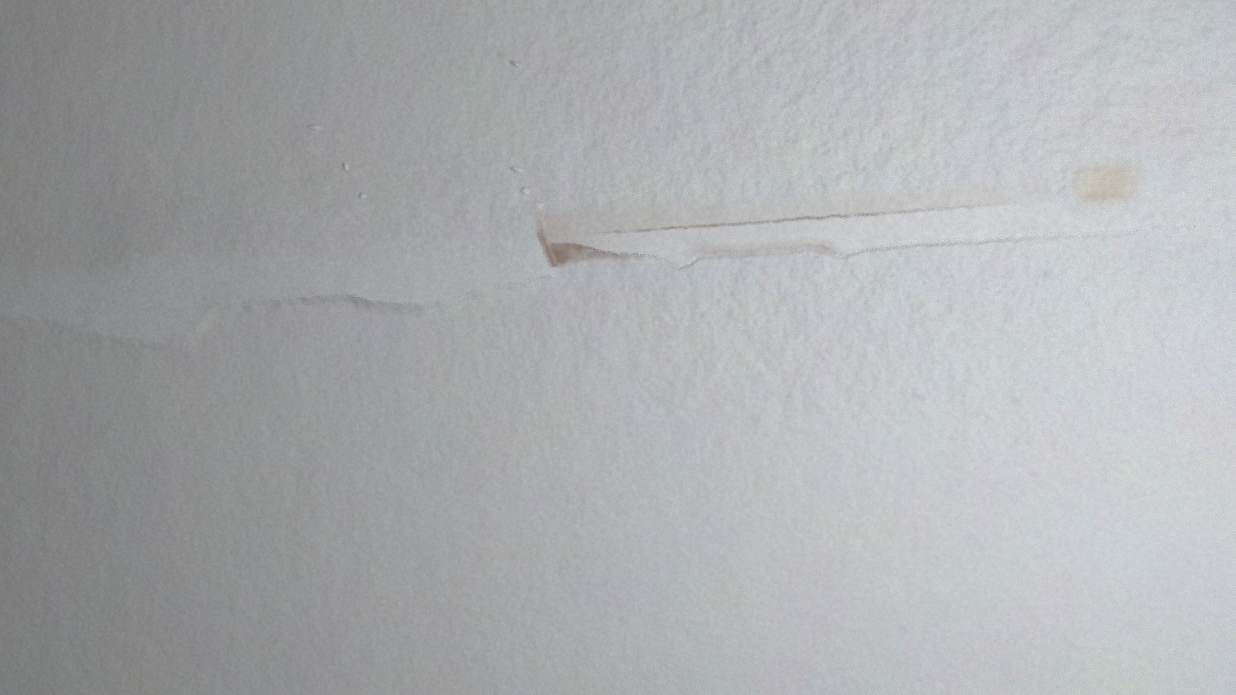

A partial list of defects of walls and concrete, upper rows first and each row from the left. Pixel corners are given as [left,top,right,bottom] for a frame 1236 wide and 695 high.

crack [582,203,1014,235]